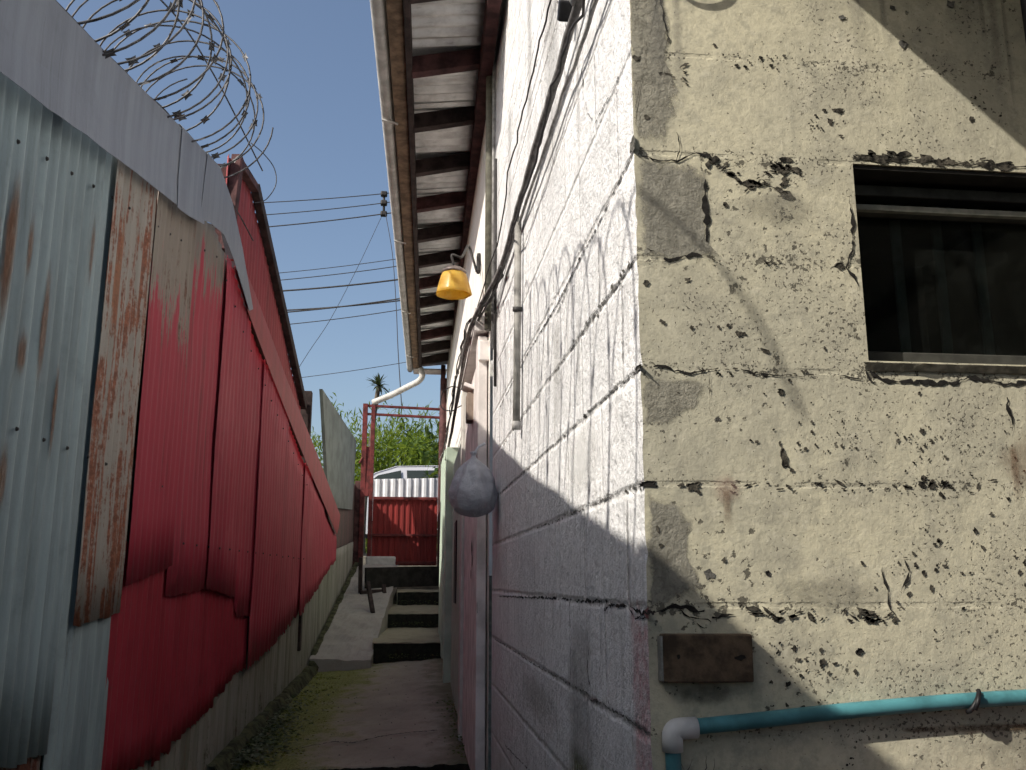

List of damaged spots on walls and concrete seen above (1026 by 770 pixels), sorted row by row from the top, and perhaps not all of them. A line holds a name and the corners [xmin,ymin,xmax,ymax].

crack [852,155,1026,171]
corrosion [1,193,18,307]
corrosion [39,284,49,366]
crack [500,133,734,446]
crack [840,197,859,286]
crack [741,369,802,377]
crack [838,369,1026,431]
corrosion [0,755,43,770]